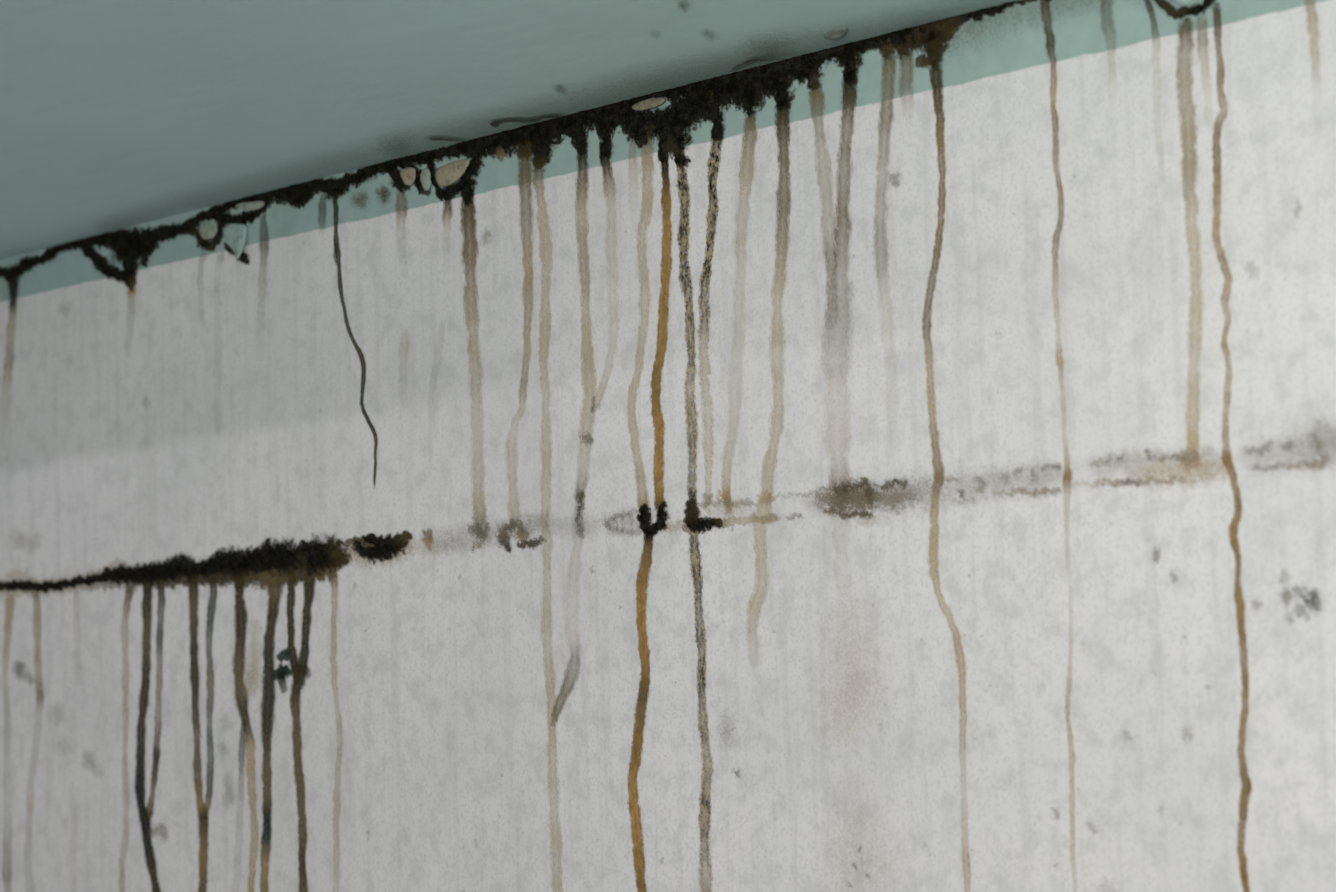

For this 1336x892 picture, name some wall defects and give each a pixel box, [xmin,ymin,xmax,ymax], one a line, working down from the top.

leakage [443,197,479,362]
crack [0,0,1051,486]
leakage [576,143,614,444]
rust [651,152,672,512]
leakage [773,106,790,298]
leakage [1040,0,1064,277]
crack [1154,0,1215,20]
rust [1212,3,1232,302]
leakage [0,530,432,892]
rust [628,535,653,892]
leakage [636,134,734,892]
rust [1221,320,1252,892]